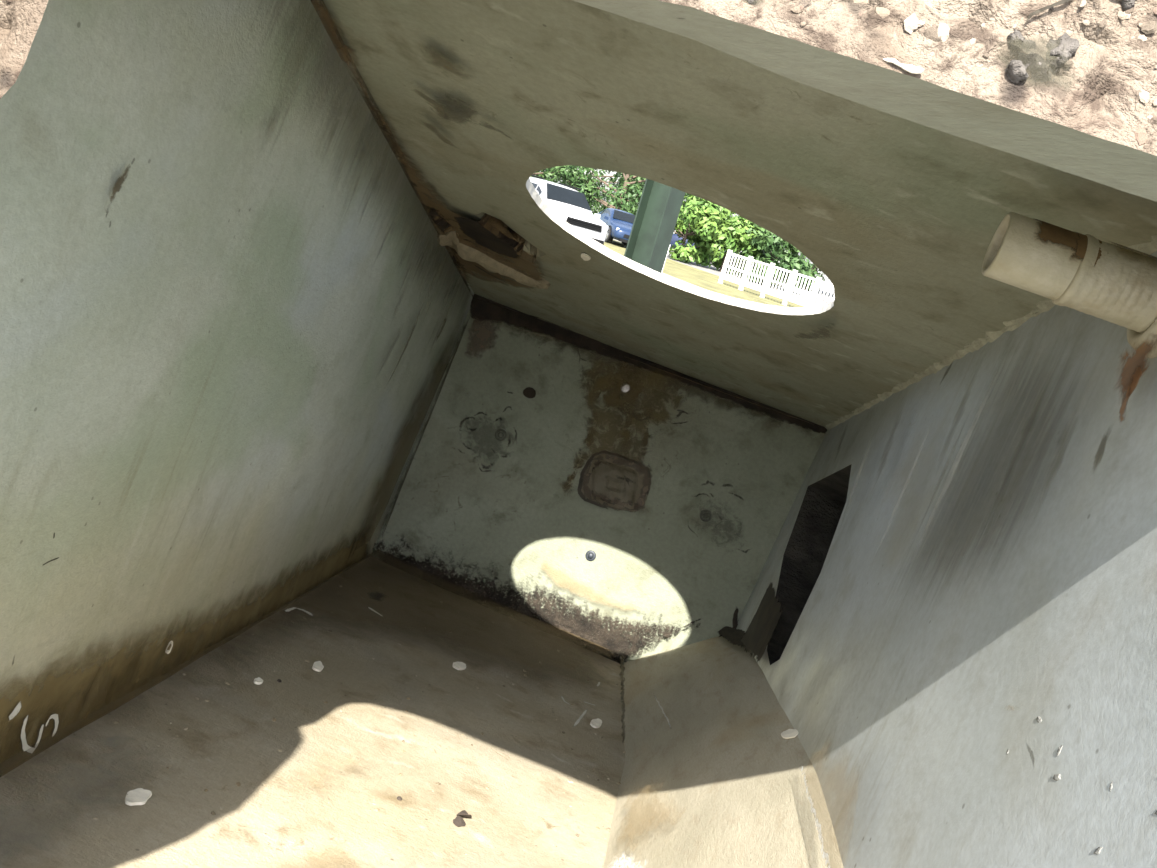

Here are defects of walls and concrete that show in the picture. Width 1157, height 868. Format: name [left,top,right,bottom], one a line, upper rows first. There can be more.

spalling [428,207,551,289]
corrosion [1119,340,1157,422]
damp [0,320,701,777]